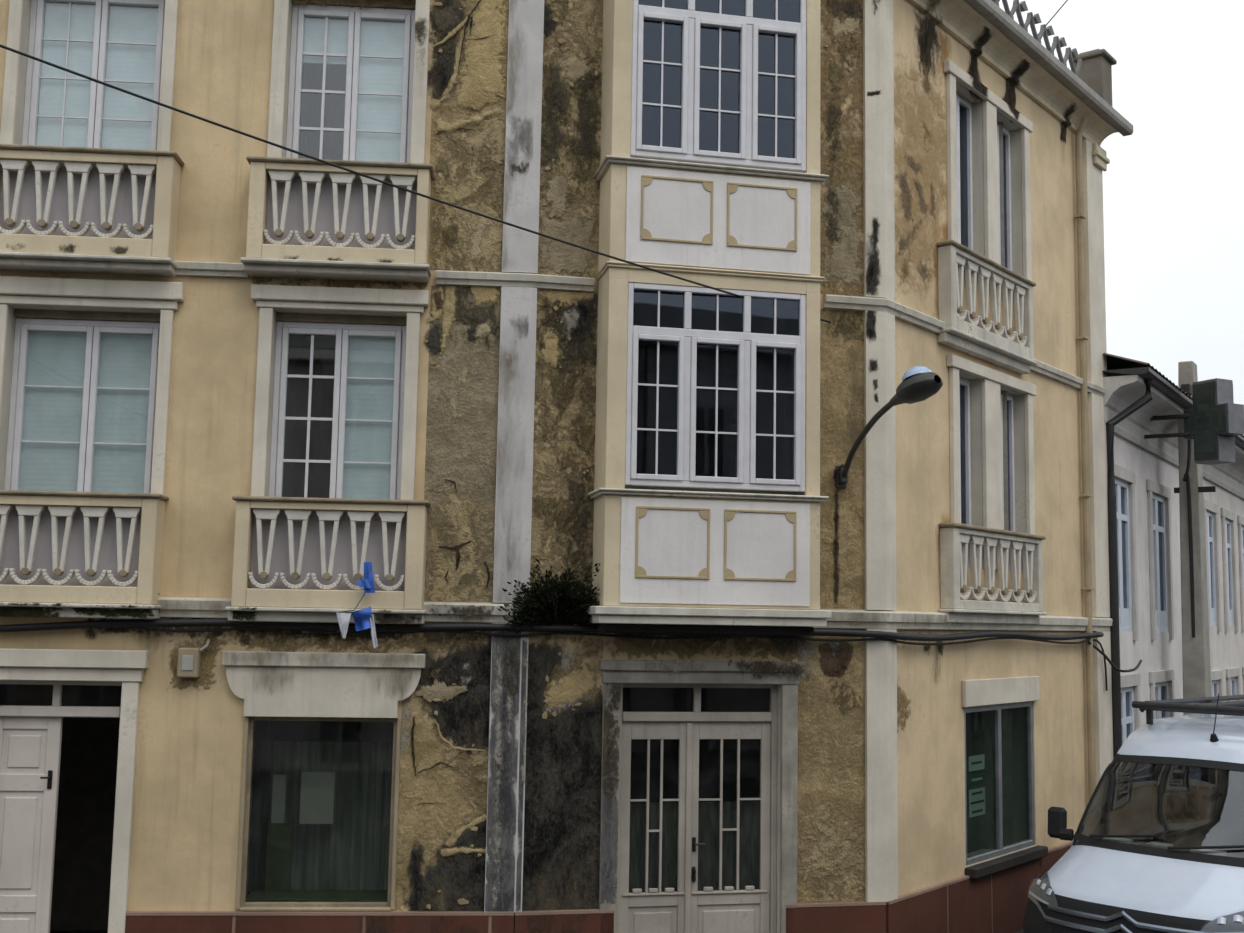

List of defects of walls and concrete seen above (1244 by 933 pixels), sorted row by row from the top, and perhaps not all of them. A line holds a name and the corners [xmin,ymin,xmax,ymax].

leakage [293,0,416,9]
leakage [415,20,426,45]
crack [431,0,497,78]
leakage [916,0,948,92]
leakage [252,276,499,365]
leakage [508,0,603,602]
leakage [820,0,864,609]
spalling [819,642,853,677]
leakage [73,604,603,933]
peeling [395,695,488,911]
crack [411,717,486,805]
peeling [534,635,621,904]